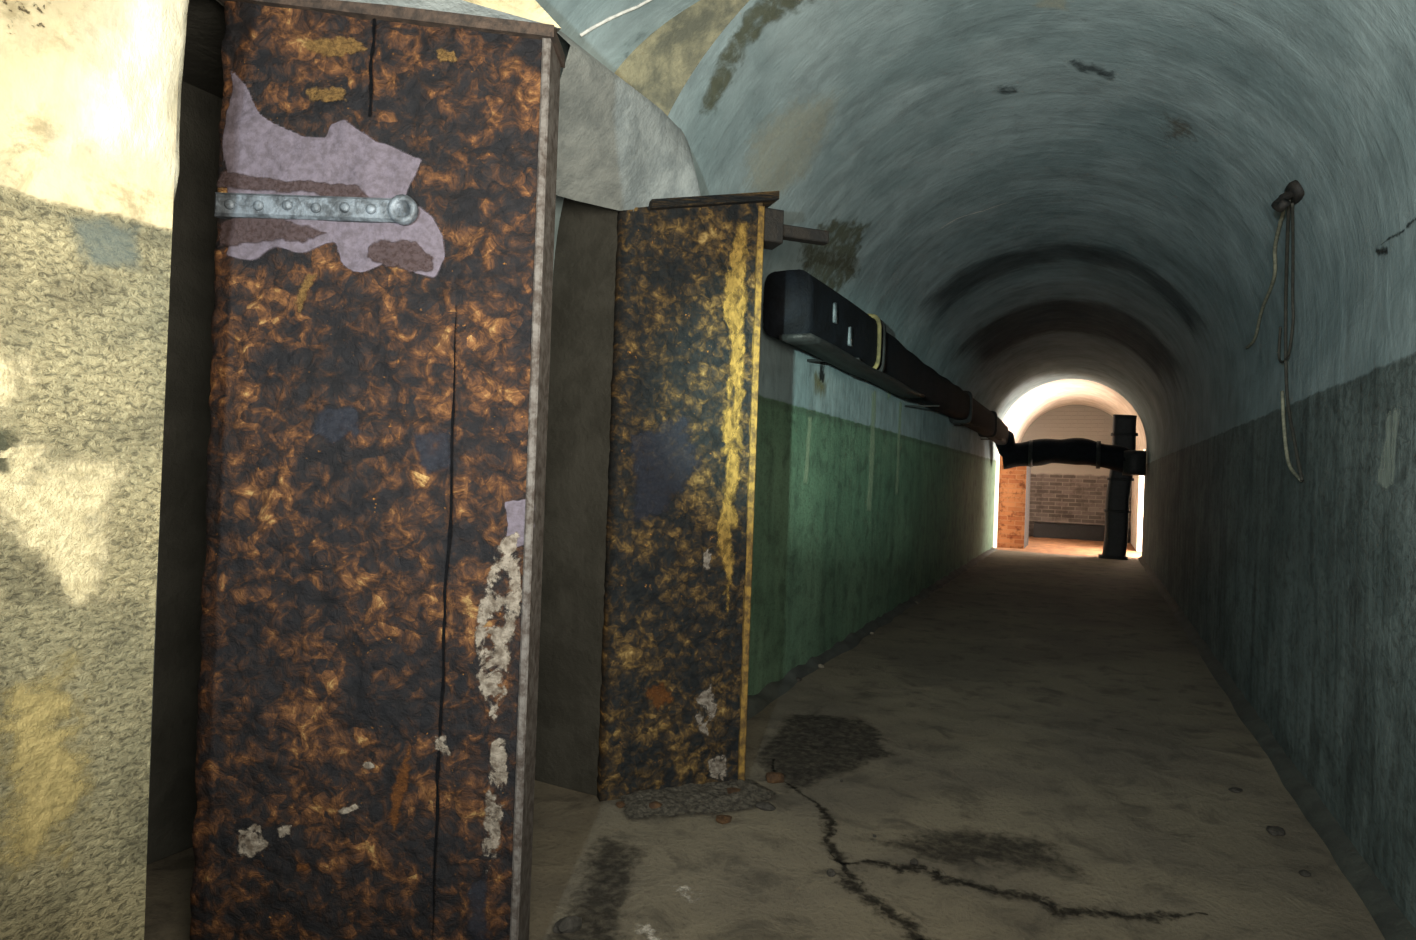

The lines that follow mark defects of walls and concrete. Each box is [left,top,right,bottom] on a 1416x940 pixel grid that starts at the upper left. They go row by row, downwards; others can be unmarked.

corrosion [306,87,345,102]
corrosion [305,36,368,57]
corrosion [437,49,456,61]
leakage [703,0,802,109]
corrosion [297,274,316,312]
peeling [0,353,34,410]
peeling [0,442,125,605]
peeling [474,532,522,720]
corrosion [389,747,410,829]
peeling [482,738,509,858]
crack [772,759,1208,940]